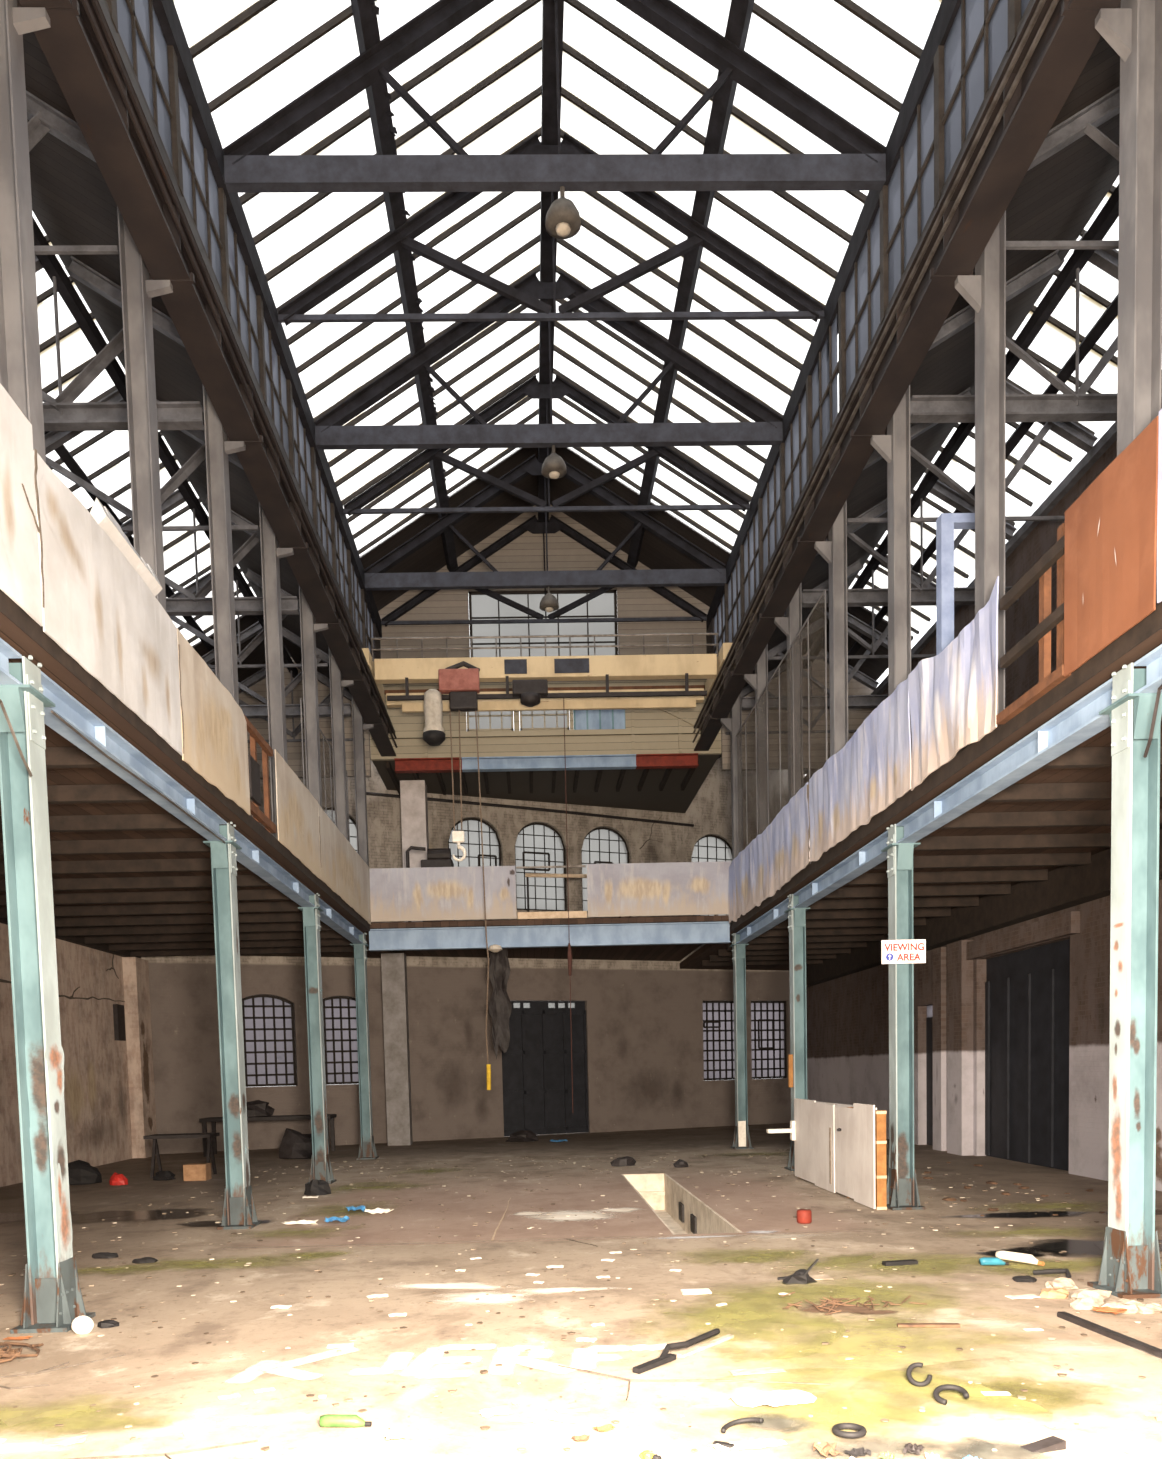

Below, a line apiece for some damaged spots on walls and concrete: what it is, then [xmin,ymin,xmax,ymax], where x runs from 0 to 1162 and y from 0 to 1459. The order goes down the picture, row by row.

crack [22,449,45,608]
rust [1111,921,1126,1000]
rust [25,1024,72,1262]
rust [1109,1068,1124,1230]